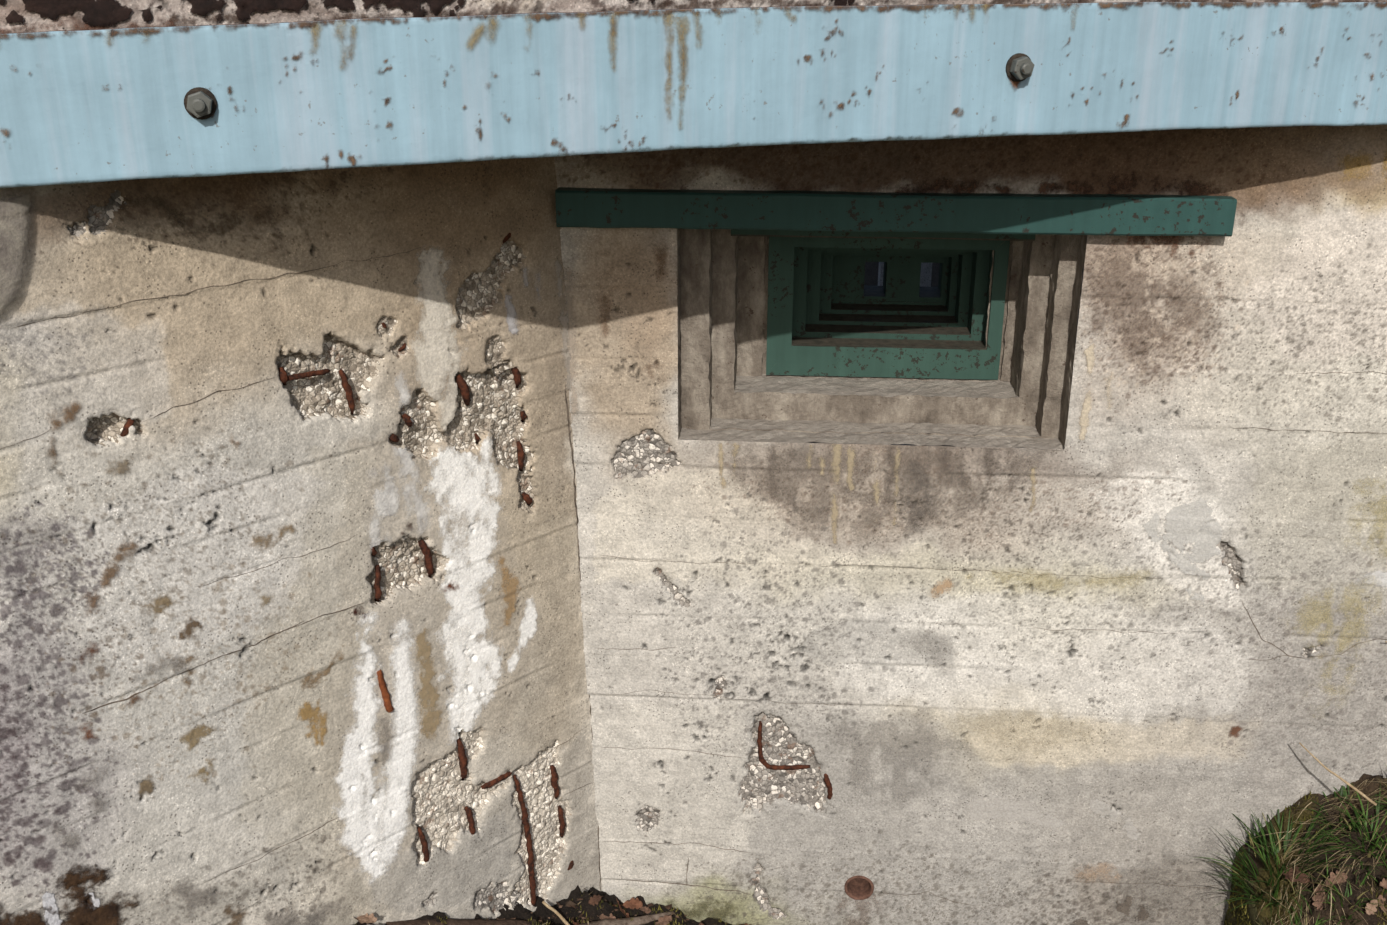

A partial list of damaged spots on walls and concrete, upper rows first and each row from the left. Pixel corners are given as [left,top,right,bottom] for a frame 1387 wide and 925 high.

rust [0,3,1081,98]
spalling [276,316,409,423]
water stain [397,249,467,430]
spalling [85,413,143,446]
spalling [389,335,536,514]
spalling [609,429,682,479]
water stain [808,444,855,543]
spalling [366,537,444,604]
water stain [370,436,537,743]
water stain [335,612,419,882]
spalling [738,712,833,813]
spalling [410,728,574,914]